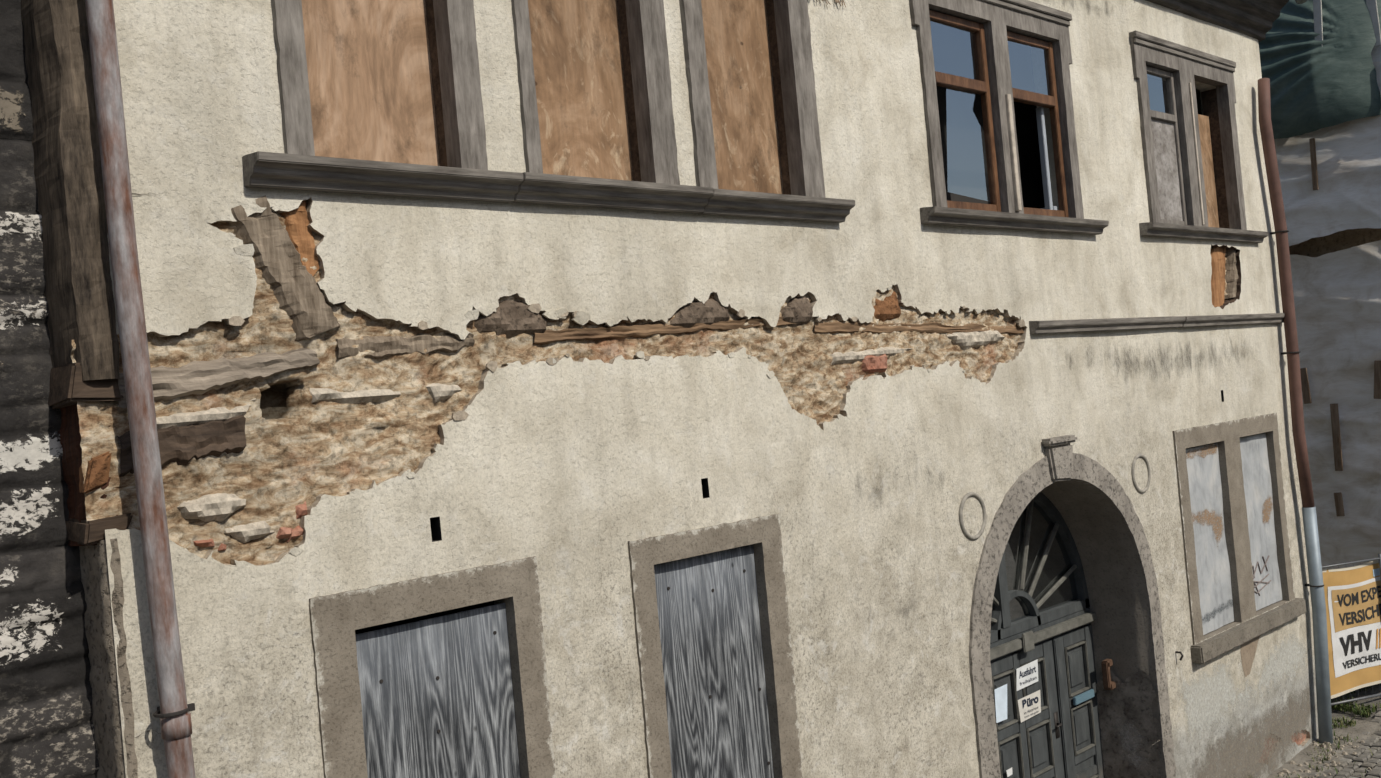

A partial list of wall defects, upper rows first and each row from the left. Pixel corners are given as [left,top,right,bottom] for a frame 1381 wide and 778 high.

spalling [1210,244,1241,309]
spalling [77,334,140,530]
spalling [147,195,1027,566]
damp [1194,691,1311,778]